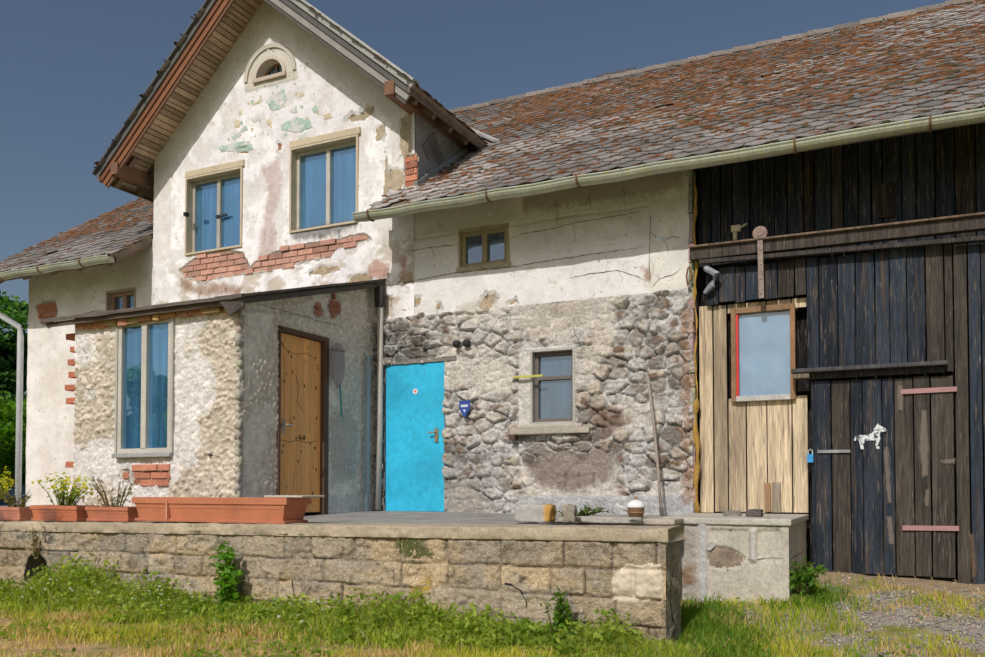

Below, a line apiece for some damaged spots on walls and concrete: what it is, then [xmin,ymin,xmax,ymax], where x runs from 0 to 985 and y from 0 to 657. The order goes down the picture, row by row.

peeling [217,62,374,155]
flaking render [375,114,419,200]
flaking render [178,232,373,284]
crack [384,210,680,288]
flaking render [35,299,58,328]
flaking render [313,293,342,320]
spalling [707,542,744,574]